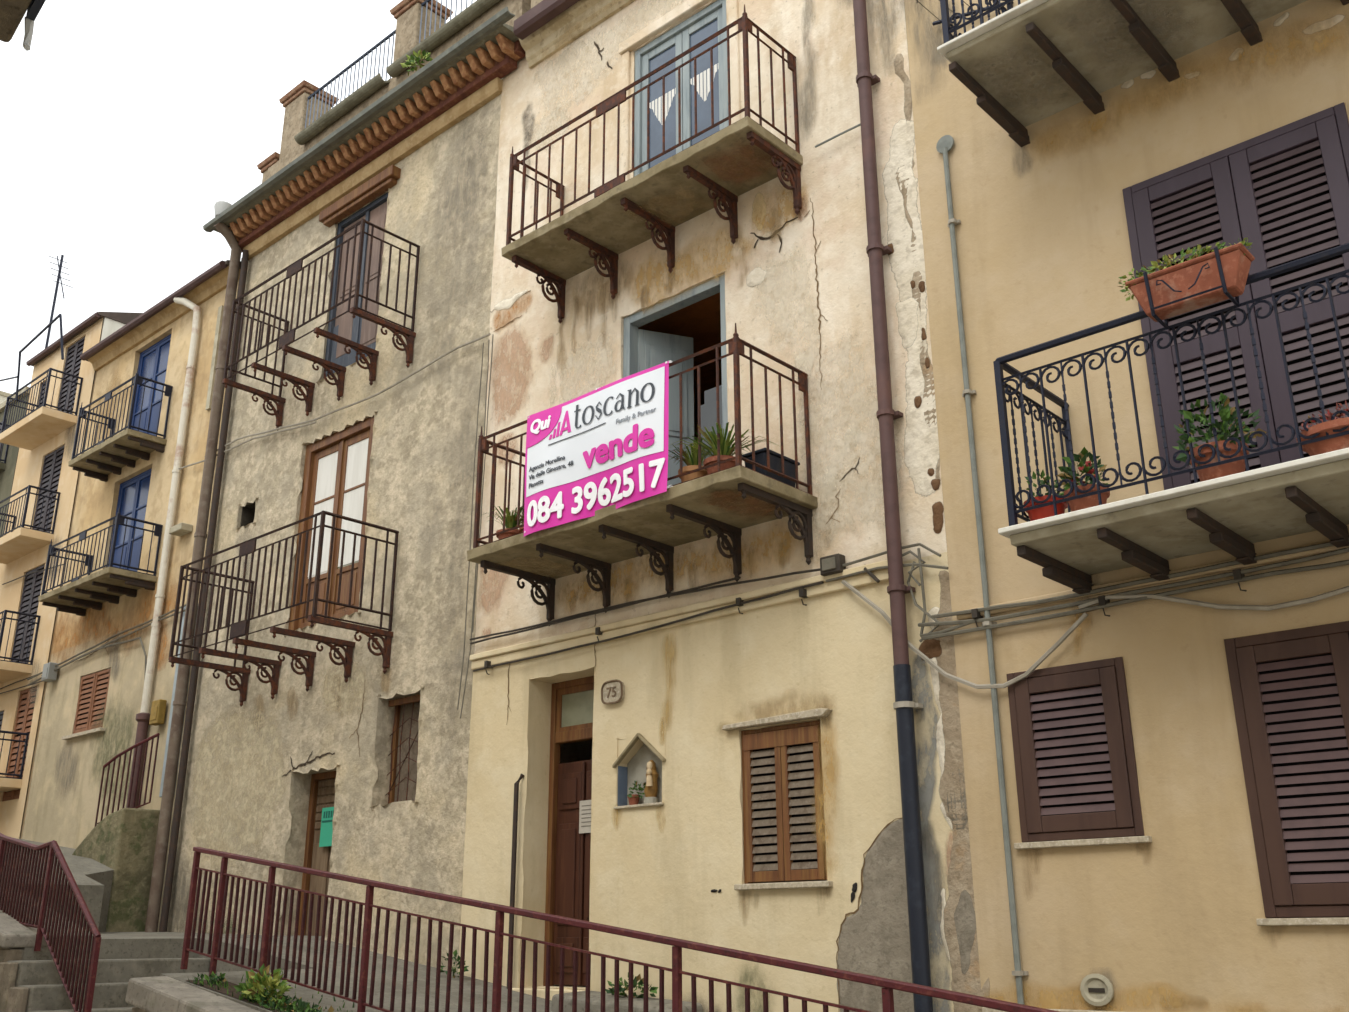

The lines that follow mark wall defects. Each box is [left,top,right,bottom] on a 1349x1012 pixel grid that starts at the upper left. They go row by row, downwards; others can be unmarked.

crack [750,199,828,390]
peeling [747,54,944,536]
crack [282,684,365,777]
spalling [837,819,914,1012]